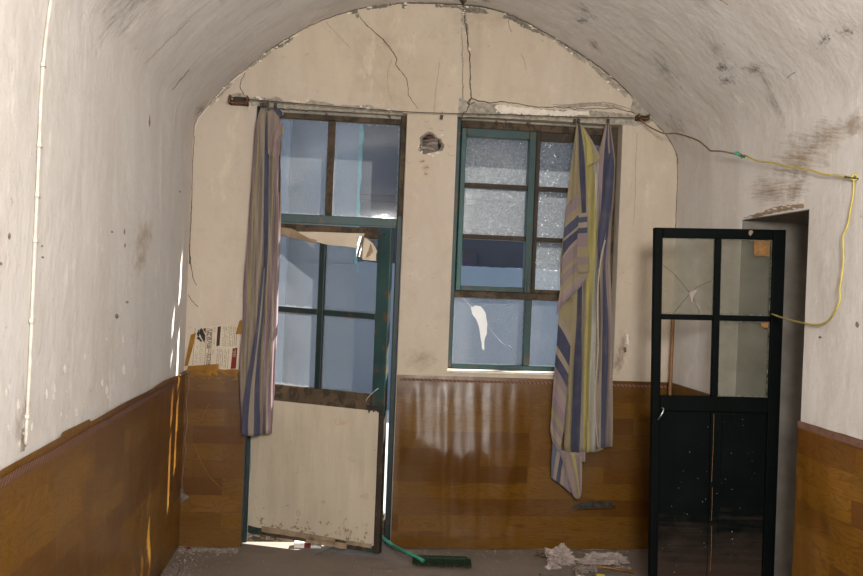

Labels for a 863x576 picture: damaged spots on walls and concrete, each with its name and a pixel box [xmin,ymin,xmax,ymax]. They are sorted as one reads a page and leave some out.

spalling [458,13,657,126]
crack [188,0,678,307]
spalling [418,121,454,157]